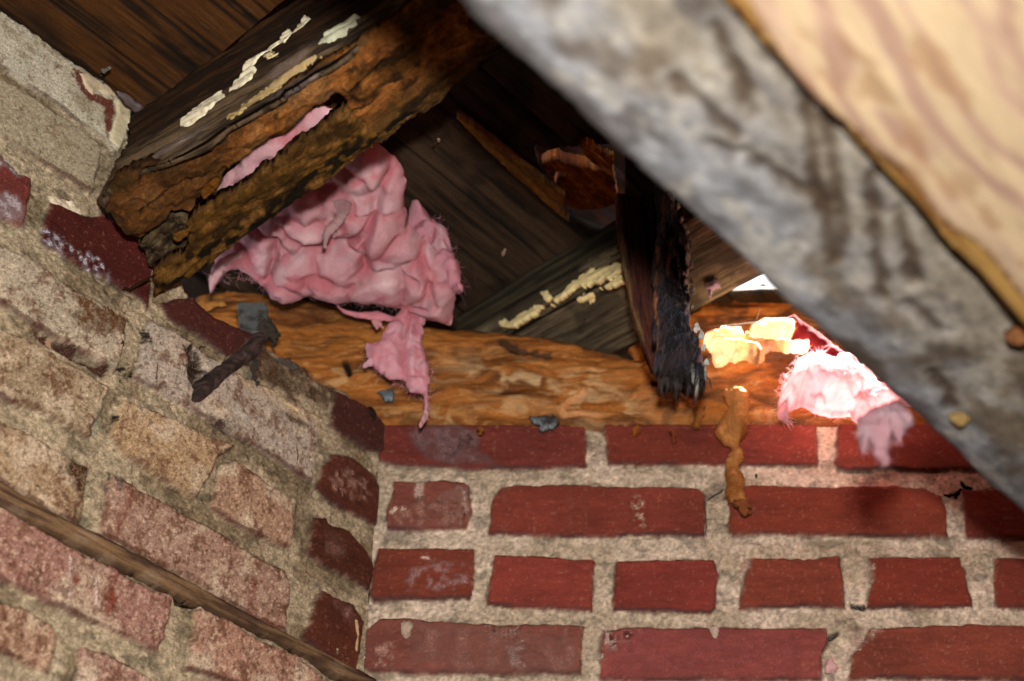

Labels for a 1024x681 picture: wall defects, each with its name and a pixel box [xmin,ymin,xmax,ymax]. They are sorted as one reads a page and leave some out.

peeling [180,15,310,127]
peeling [227,14,360,120]
leakage [43,230,104,276]